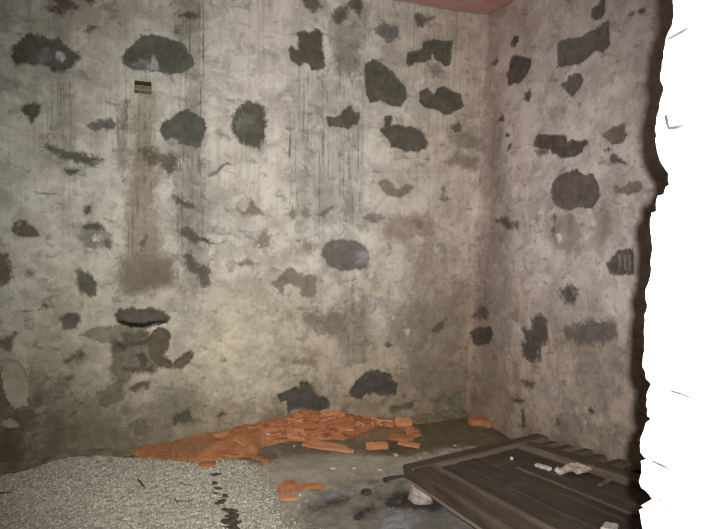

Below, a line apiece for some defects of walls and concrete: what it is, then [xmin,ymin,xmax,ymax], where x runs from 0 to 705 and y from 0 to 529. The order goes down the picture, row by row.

flaking render [122,34,194,74]
flaking render [288,29,325,70]
flaking render [557,0,610,97]
flaking render [364,59,407,107]
flaking render [419,86,464,115]
flaking render [142,109,206,174]
flaking render [232,100,267,150]
flaking render [380,115,428,152]
flaking render [551,169,599,211]
flaking render [321,240,370,271]
flaking render [60,306,194,386]
flaking render [349,370,398,399]